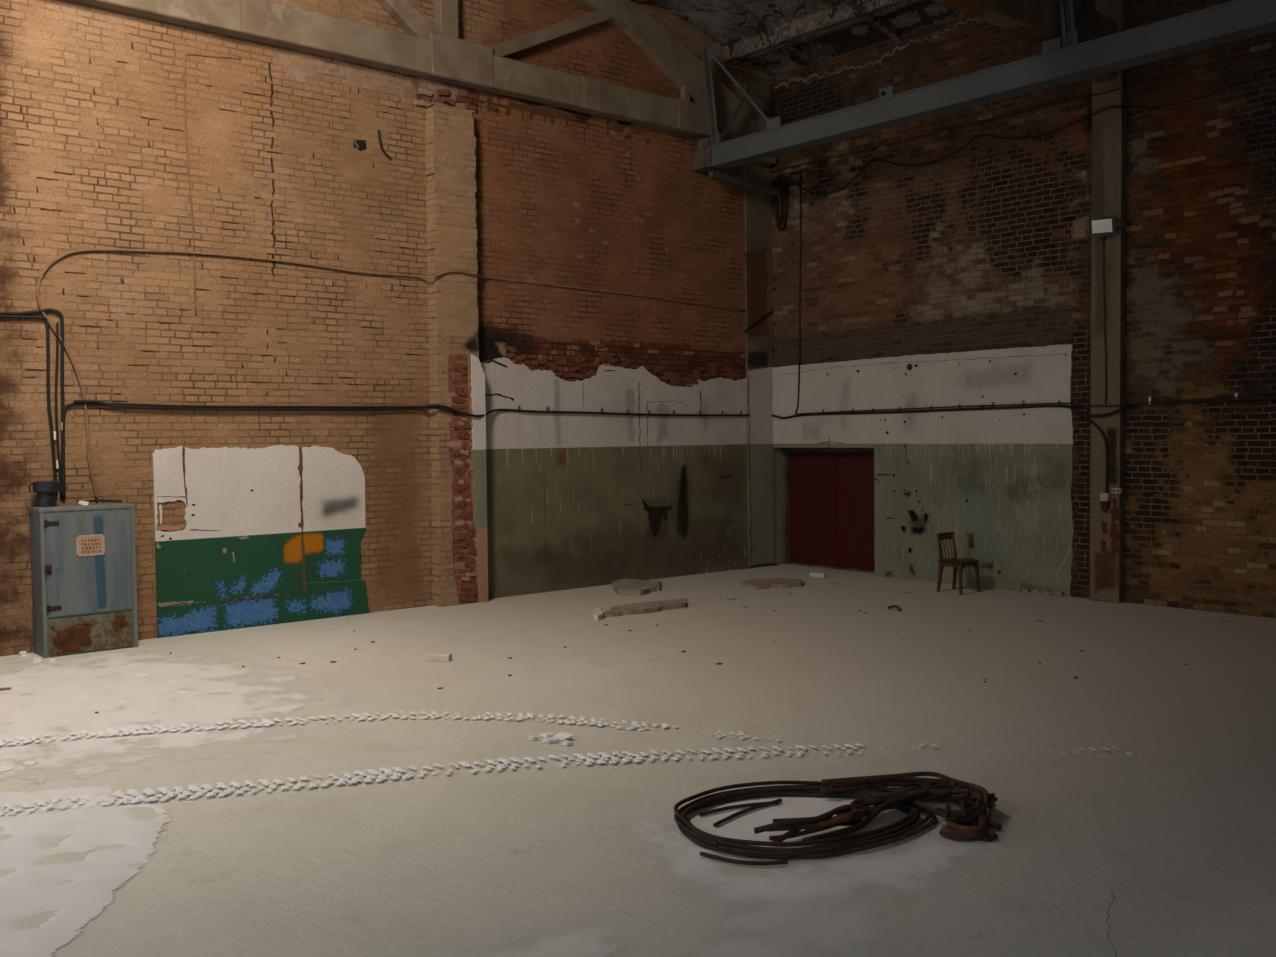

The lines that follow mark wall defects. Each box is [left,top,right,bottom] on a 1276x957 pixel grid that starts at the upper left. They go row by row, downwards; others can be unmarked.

peeling [809,0,955,55]
crack [268,62,276,276]
spalling [156,504,196,548]
peeling [153,536,354,637]